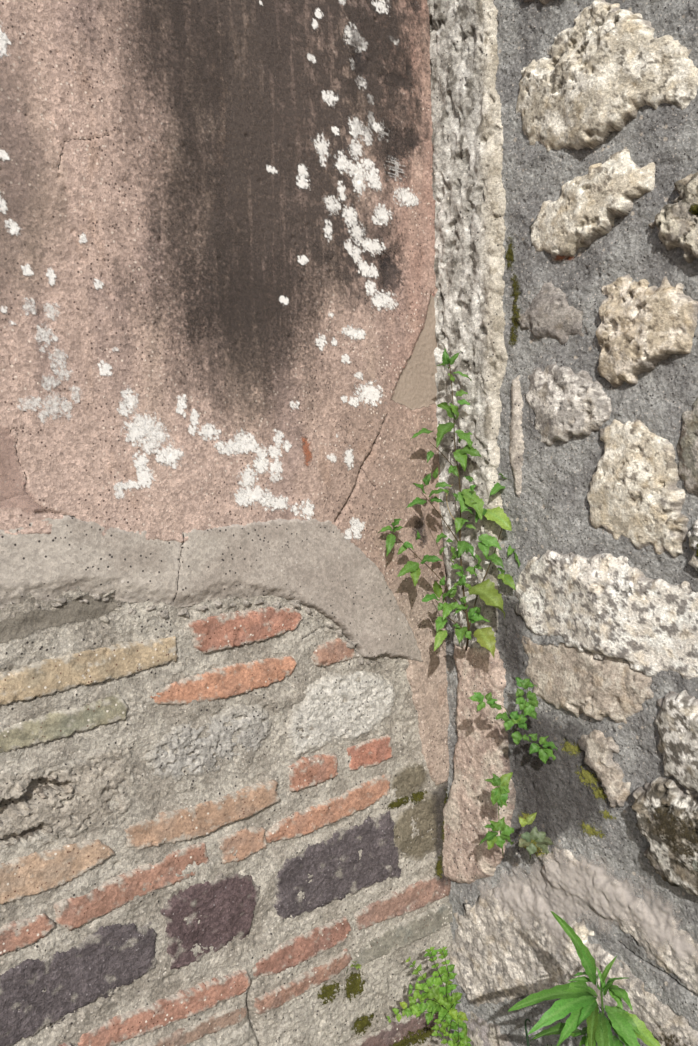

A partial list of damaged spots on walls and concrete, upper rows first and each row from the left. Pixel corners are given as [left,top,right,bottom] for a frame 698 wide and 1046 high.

damp [123,0,428,411]
damp [114,388,184,499]
damp [176,379,314,520]
damp [327,445,354,471]
damp [344,517,365,540]